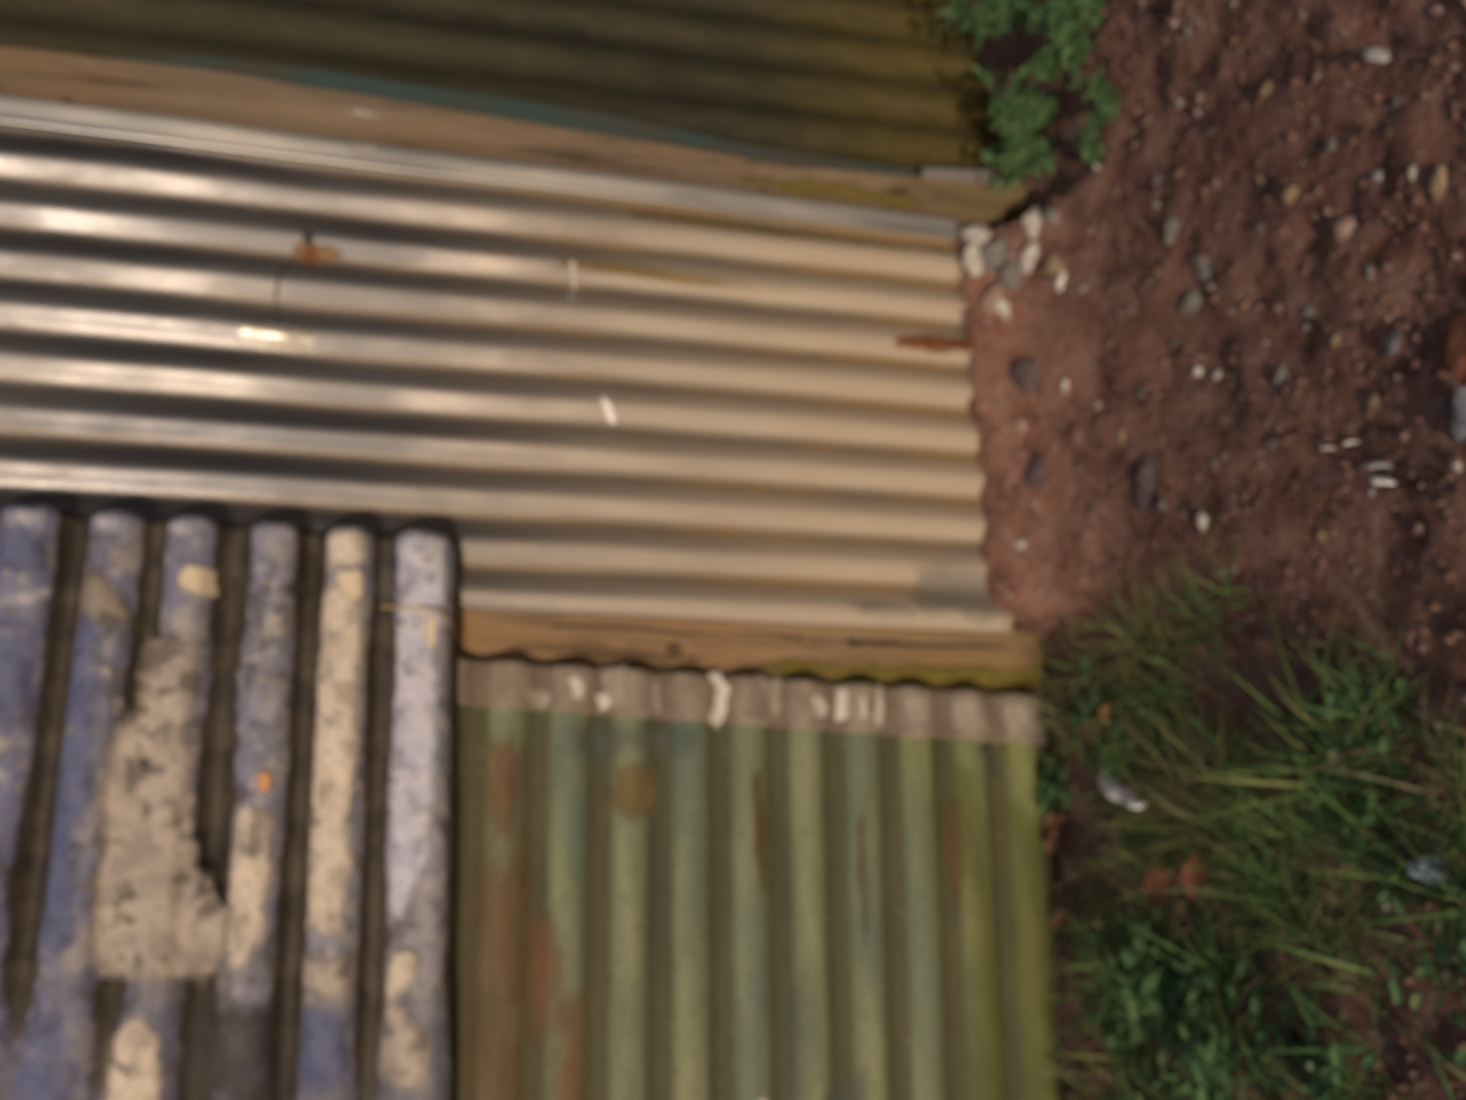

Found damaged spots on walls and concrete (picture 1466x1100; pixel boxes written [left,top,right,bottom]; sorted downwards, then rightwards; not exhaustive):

corrosion [294,242,340,264]
corrosion [896,335,975,354]
peeling [89,635,273,984]
peeling [106,1019,165,1100]